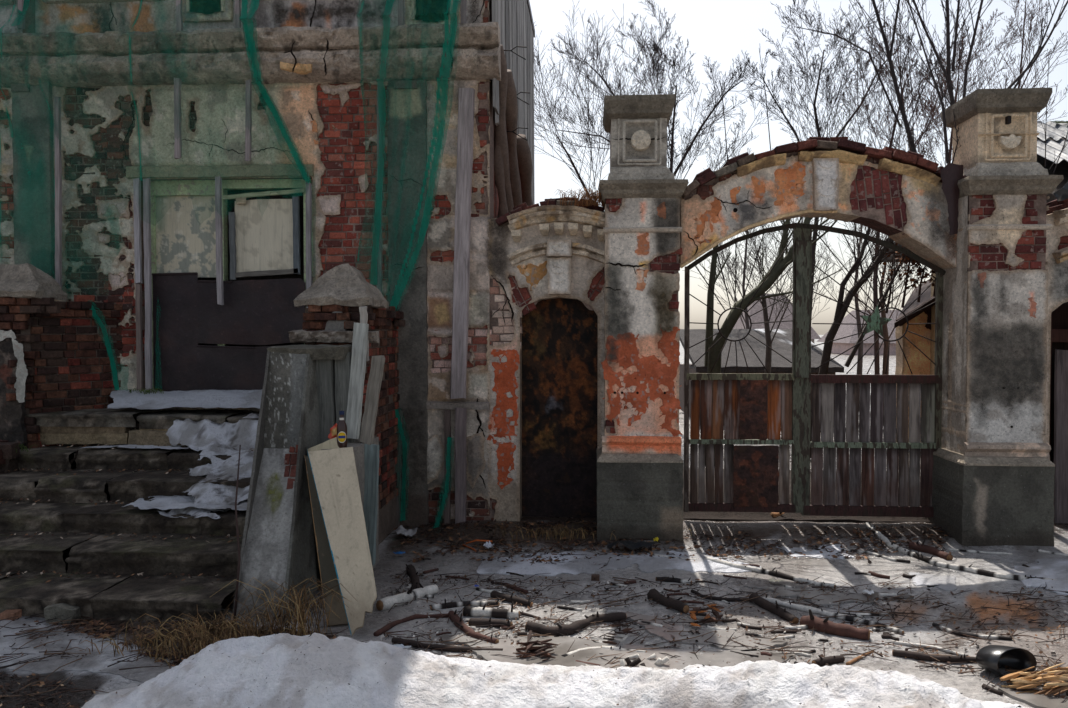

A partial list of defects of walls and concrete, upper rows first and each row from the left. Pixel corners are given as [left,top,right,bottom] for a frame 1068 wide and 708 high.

crack [284,0,337,75]
flaking render [0,171,14,222]
flaking render [64,86,153,367]
flaking render [310,83,388,300]
flaking render [634,232,683,291]
flaking render [667,290,679,312]
peeling [684,149,818,246]
flaking render [838,149,907,235]
flaking render [968,194,1068,288]
flaking render [0,330,28,403]
peeling [428,261,547,524]
peeling [601,326,683,436]